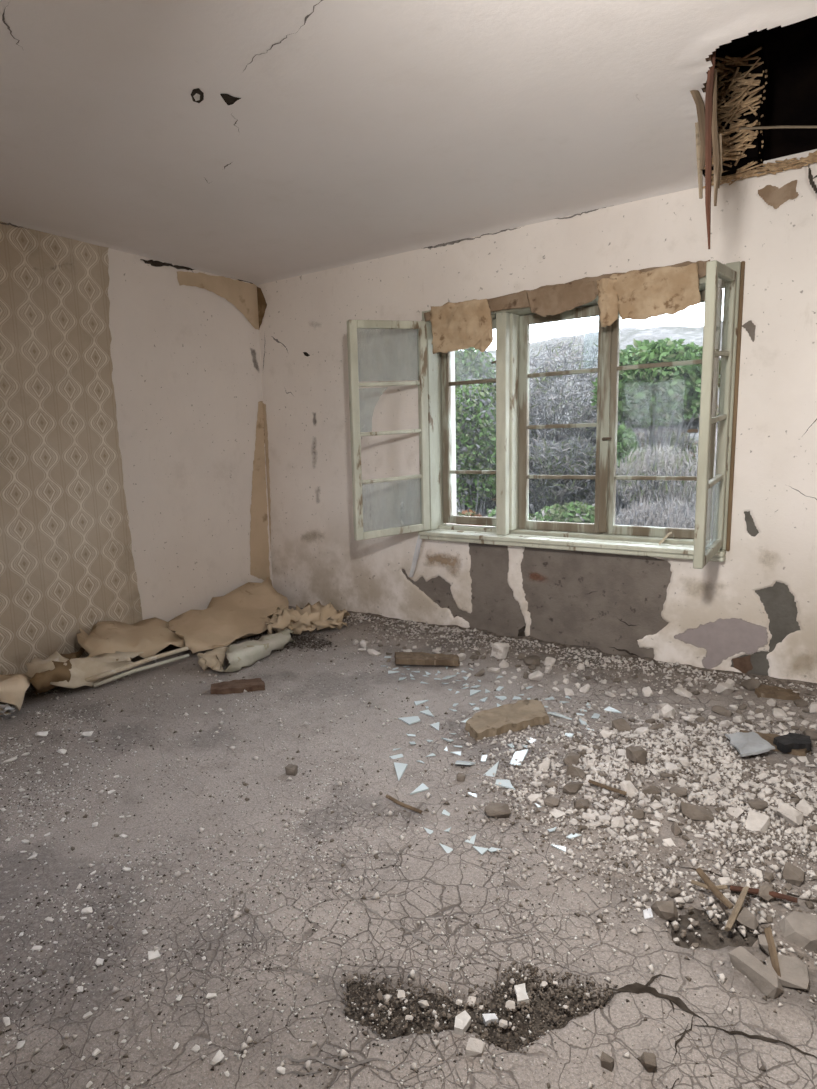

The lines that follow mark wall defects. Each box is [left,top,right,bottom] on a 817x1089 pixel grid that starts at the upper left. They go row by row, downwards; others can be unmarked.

crack [2,6,23,49]
crack [242,0,323,73]
spalling [758,180,799,209]
crack [808,166,817,193]
spalling [402,536,800,675]
crack [681,850,762,877]
crack [747,879,817,903]
crack [601,974,817,1089]